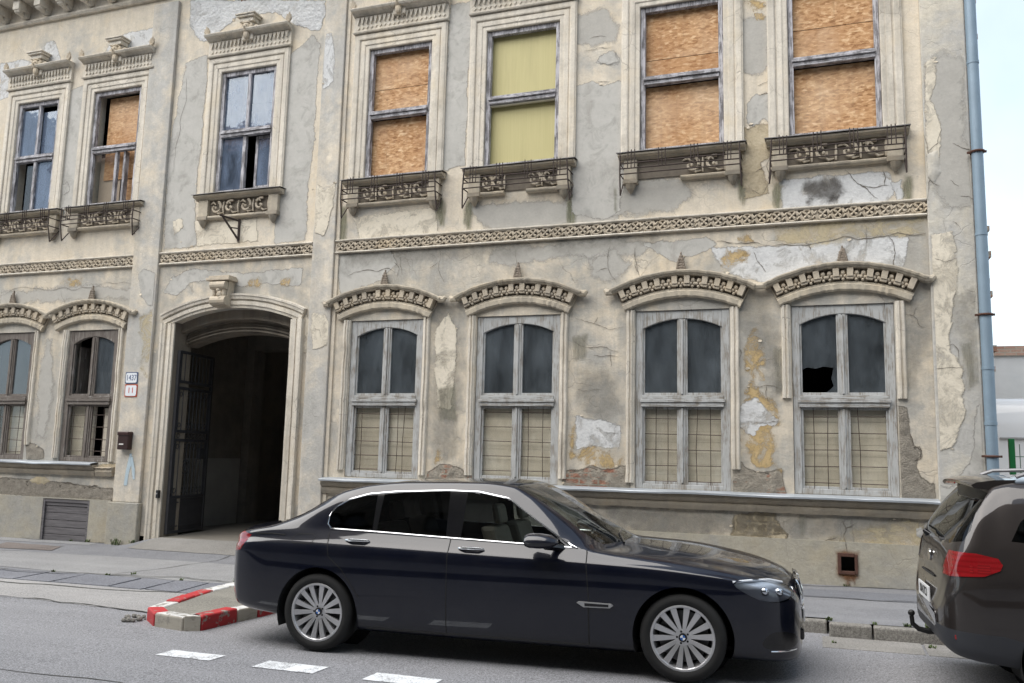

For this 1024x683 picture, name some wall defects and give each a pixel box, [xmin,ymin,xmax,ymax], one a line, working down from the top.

peeling [190,0,336,244]
peeling [924,49,971,208]
peeling [489,218,921,282]
peeling [434,313,458,410]
spalling [425,450,472,479]
spalling [562,415,630,488]
spalling [733,328,787,494]
peeling [898,231,983,503]